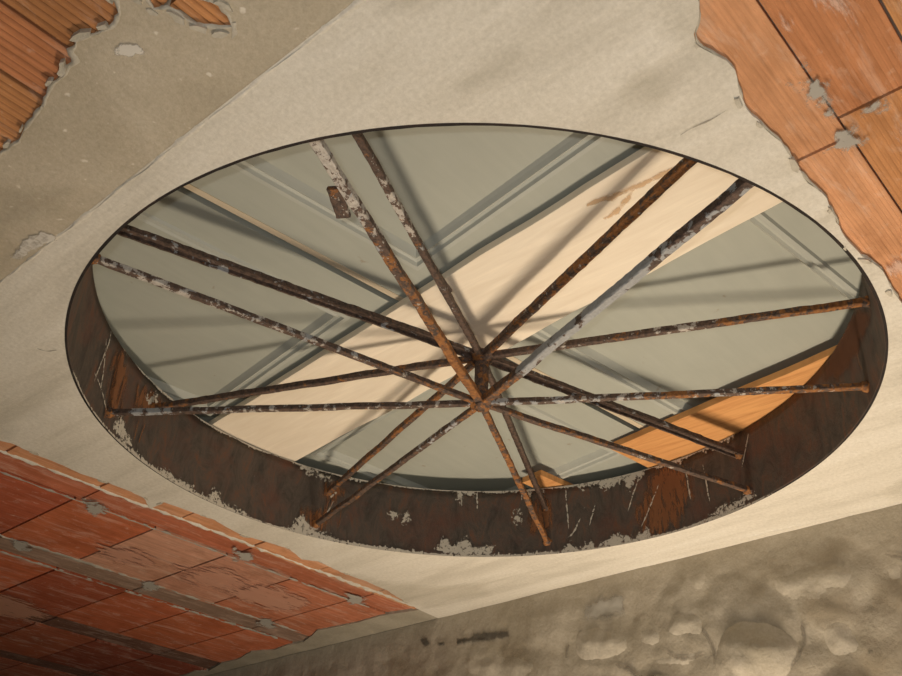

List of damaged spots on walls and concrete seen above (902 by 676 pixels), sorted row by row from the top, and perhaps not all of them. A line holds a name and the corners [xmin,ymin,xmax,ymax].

spalling [131,0,238,39]
spalling [0,0,121,157]
spalling [694,0,839,225]
peeling [135,363,175,405]
corrosion [825,310,869,397]
peeling [74,374,773,557]
corrosion [635,462,694,535]